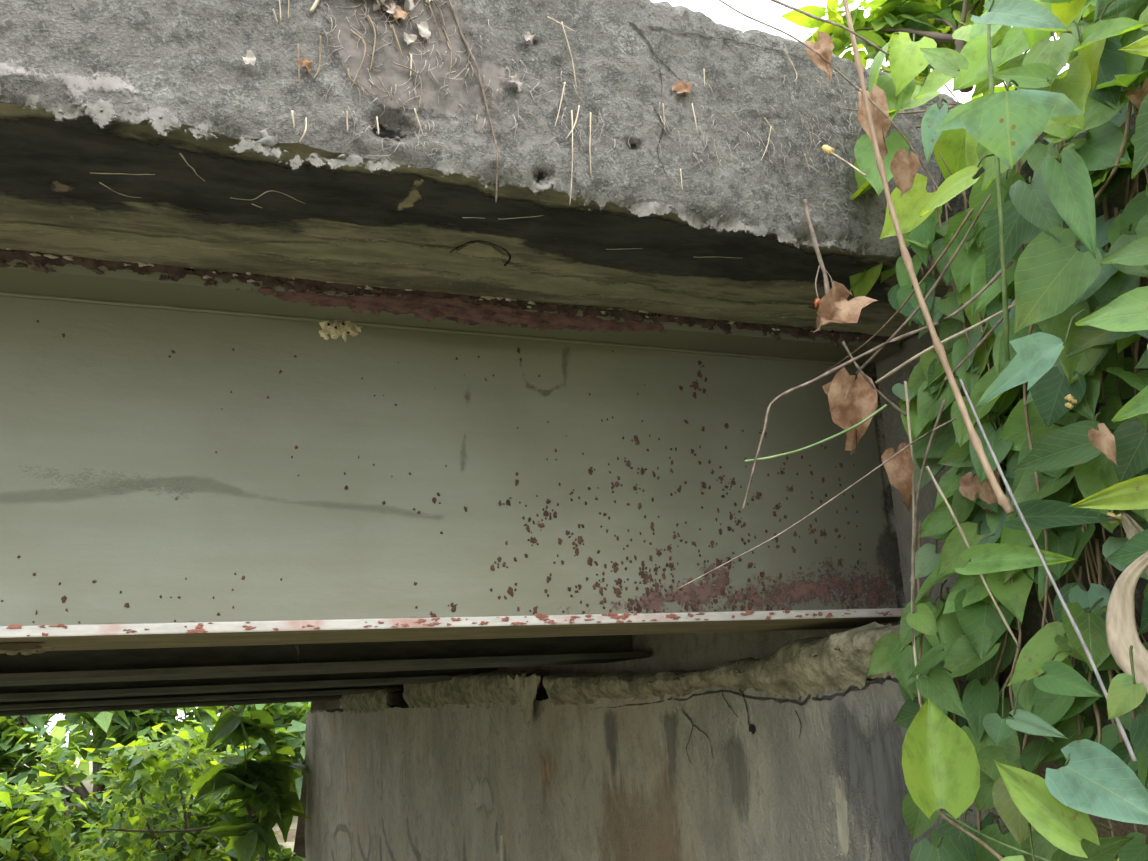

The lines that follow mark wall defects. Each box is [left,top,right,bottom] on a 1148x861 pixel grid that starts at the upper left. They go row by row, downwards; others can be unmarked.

spalling [21,93,217,138]
spalling [230,130,410,171]
spalling [54,181,71,192]
water stain [0,115,896,335]
corrosion [0,249,898,347]
corrosion [863,362,883,421]
corrosion [363,434,904,628]
corrosion [7,582,81,636]
corrosion [174,606,234,633]
crack [590,676,899,764]